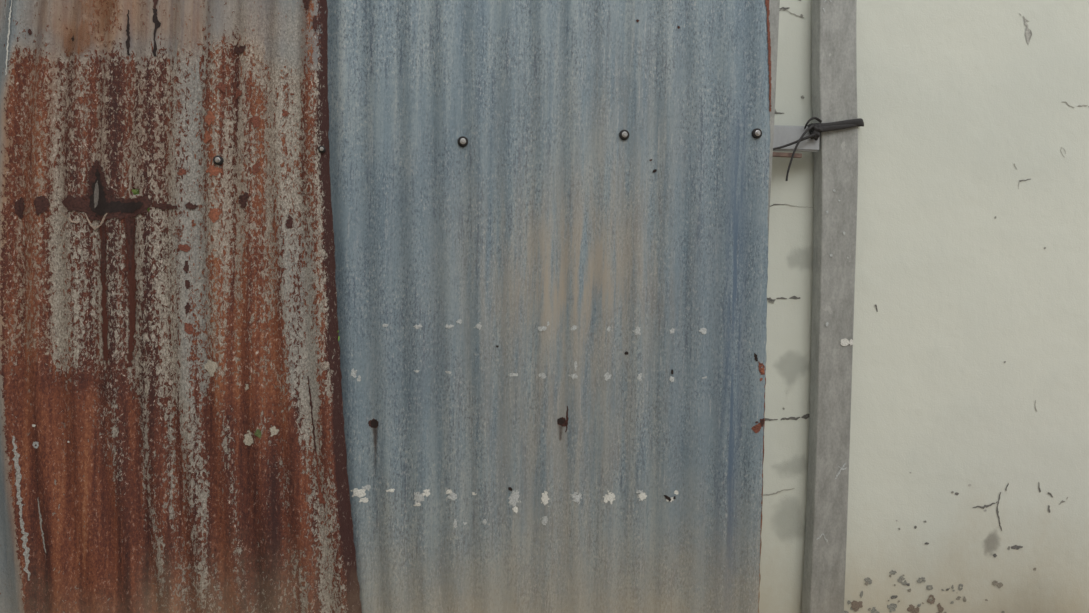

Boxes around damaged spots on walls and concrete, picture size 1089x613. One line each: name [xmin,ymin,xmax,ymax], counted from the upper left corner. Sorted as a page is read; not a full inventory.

spalling [1019,13,1032,45]
rust [238,192,249,208]
rust [178,244,191,289]
rust [99,218,109,361]
rust [124,217,137,367]
rust [184,303,193,334]
crack [767,295,800,303]
crack [765,407,809,421]
crack [968,483,1009,531]
peeling [844,570,966,613]